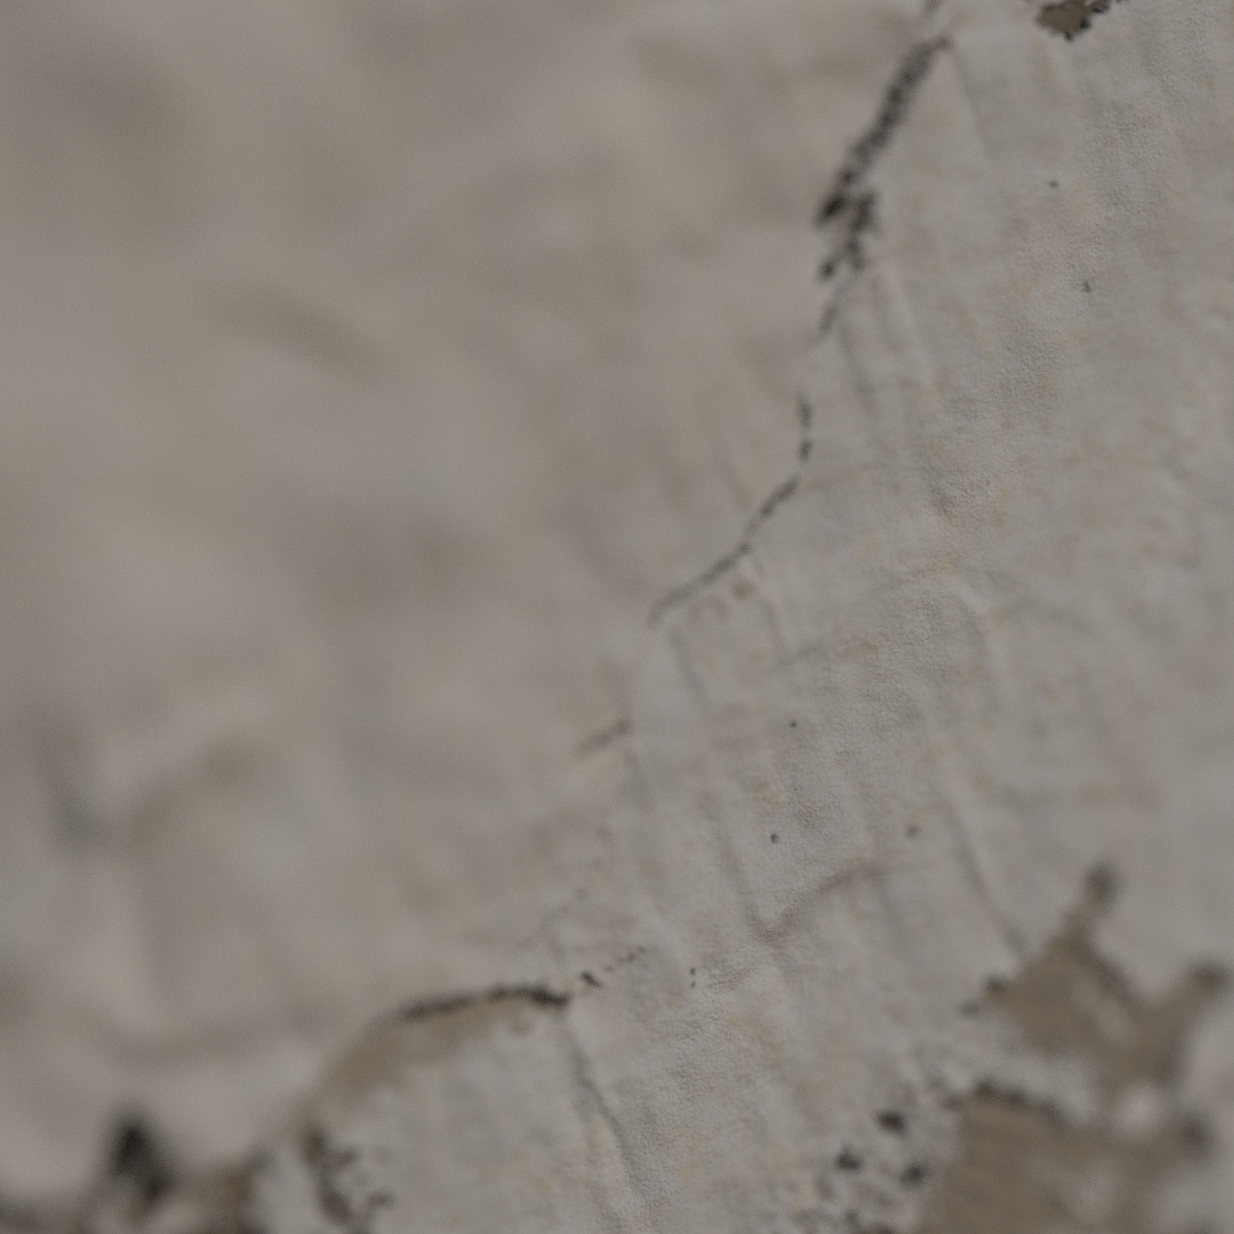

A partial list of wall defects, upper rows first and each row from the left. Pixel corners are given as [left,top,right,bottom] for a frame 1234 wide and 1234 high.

spalling [1026,0,1118,43]
crack [651,1,976,627]
flaking render [0,0,932,1234]
crack [494,948,643,998]
spalling [958,859,1234,1128]